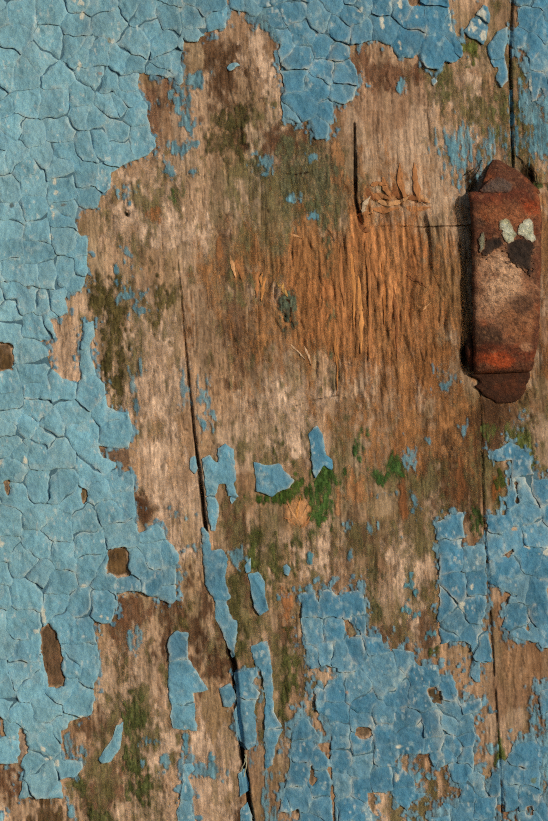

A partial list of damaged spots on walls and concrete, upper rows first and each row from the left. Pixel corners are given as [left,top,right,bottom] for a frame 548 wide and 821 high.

peeling [227,0,463,140]
peeling [455,54,483,144]
crack [354,126,364,222]
peeling [0,0,239,799]
peeling [242,366,340,497]
crack [195,447,208,532]
crack [222,633,237,708]
peeling [135,442,548,821]
crack [238,742,253,821]